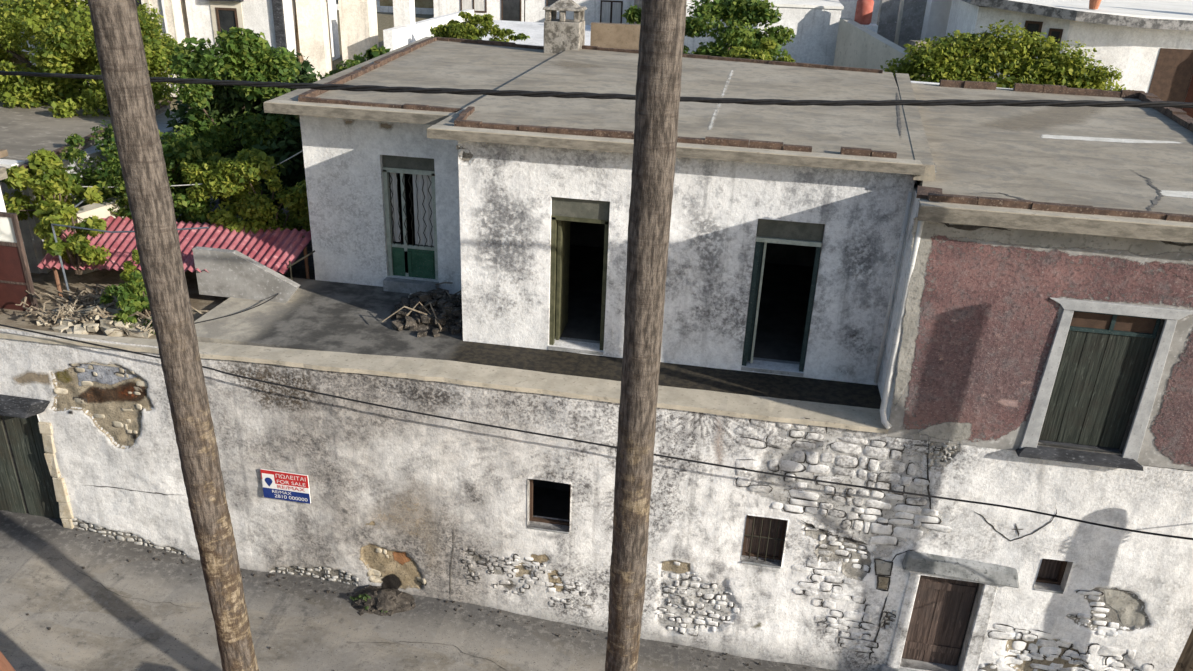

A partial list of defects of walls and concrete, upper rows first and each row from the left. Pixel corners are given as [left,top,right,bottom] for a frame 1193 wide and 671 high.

crack [1132,170,1164,211]
crack [939,222,1011,231]
crack [1161,239,1193,247]
flaking render [51,362,152,449]
flaking render [747,418,972,591]
crack [975,504,1057,542]
flaking render [269,544,427,589]
flaking render [461,548,591,609]
flaking render [656,560,739,636]
flaking render [1067,587,1151,638]
flaking render [979,638,1132,671]